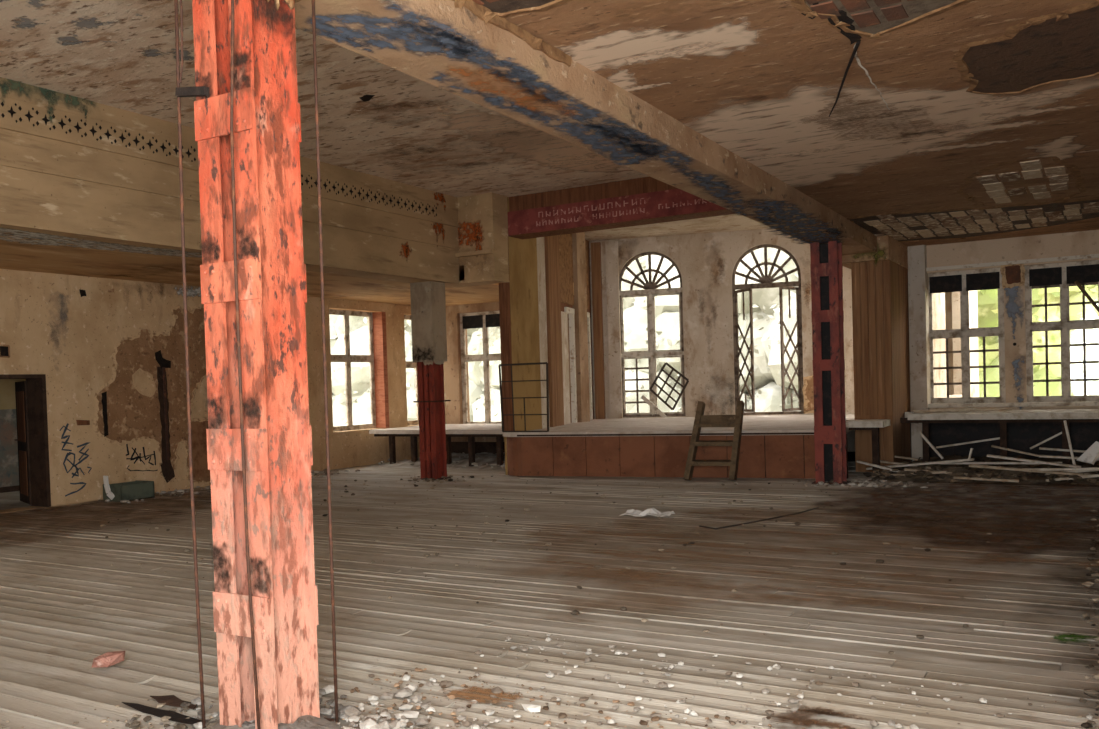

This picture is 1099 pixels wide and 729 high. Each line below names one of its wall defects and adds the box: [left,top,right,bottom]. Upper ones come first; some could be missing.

crack [801,2,890,117]
flaking render [952,0,1099,95]
peeling [305,0,842,244]
flaking render [847,156,1099,242]
flaking render [93,287,211,504]
flaking render [802,375,814,414]